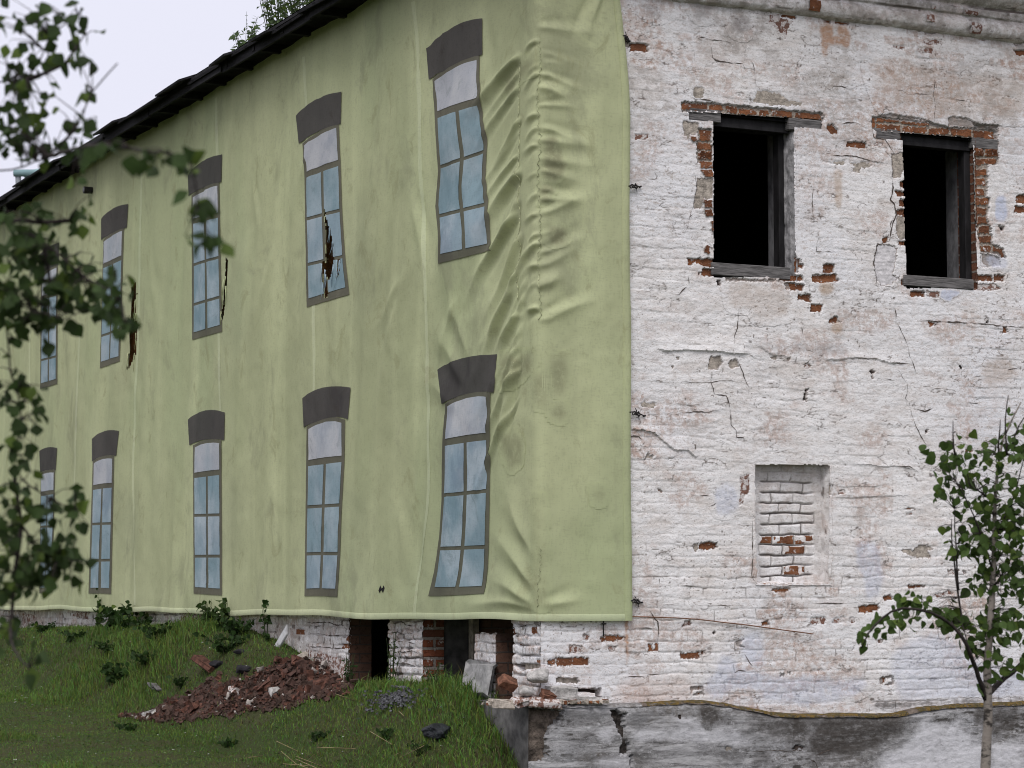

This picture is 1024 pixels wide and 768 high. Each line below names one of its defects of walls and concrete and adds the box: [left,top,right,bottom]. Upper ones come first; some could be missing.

flaking render [681,87,837,231]
flaking render [871,115,1004,297]
flaking render [687,245,712,277]
flaking render [780,257,838,323]
crack [826,122,1021,448]
crack [656,312,748,438]
flaking render [693,542,716,552]
flaking render [903,546,931,558]
flaking render [537,657,588,666]
flaking render [680,651,703,659]
damp [543,625,1024,768]
crack [610,710,630,763]